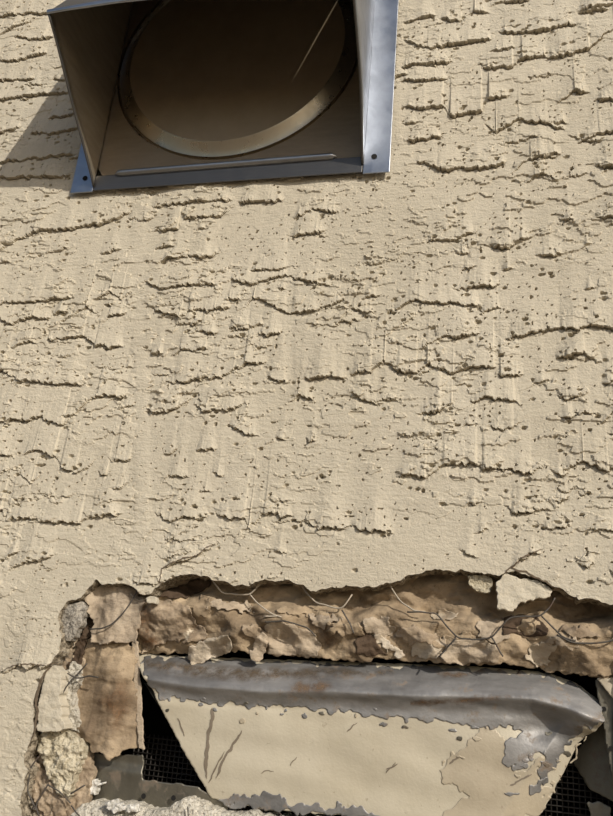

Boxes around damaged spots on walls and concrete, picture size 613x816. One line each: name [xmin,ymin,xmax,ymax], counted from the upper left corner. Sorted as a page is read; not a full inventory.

peeling [20,569,613,816]